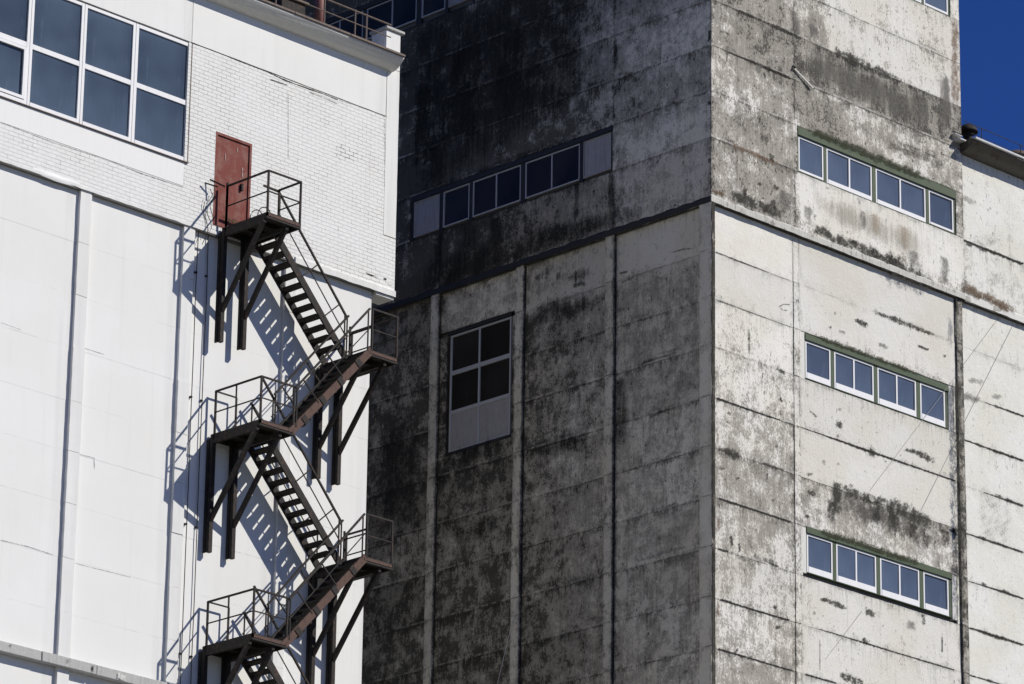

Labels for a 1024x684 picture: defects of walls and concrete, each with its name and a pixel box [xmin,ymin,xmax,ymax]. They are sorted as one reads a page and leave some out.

leakage [408,0,592,192]
leakage [811,46,945,131]
leakage [420,174,639,292]
leakage [732,182,791,219]
leakage [805,204,950,291]
leakage [808,376,983,625]